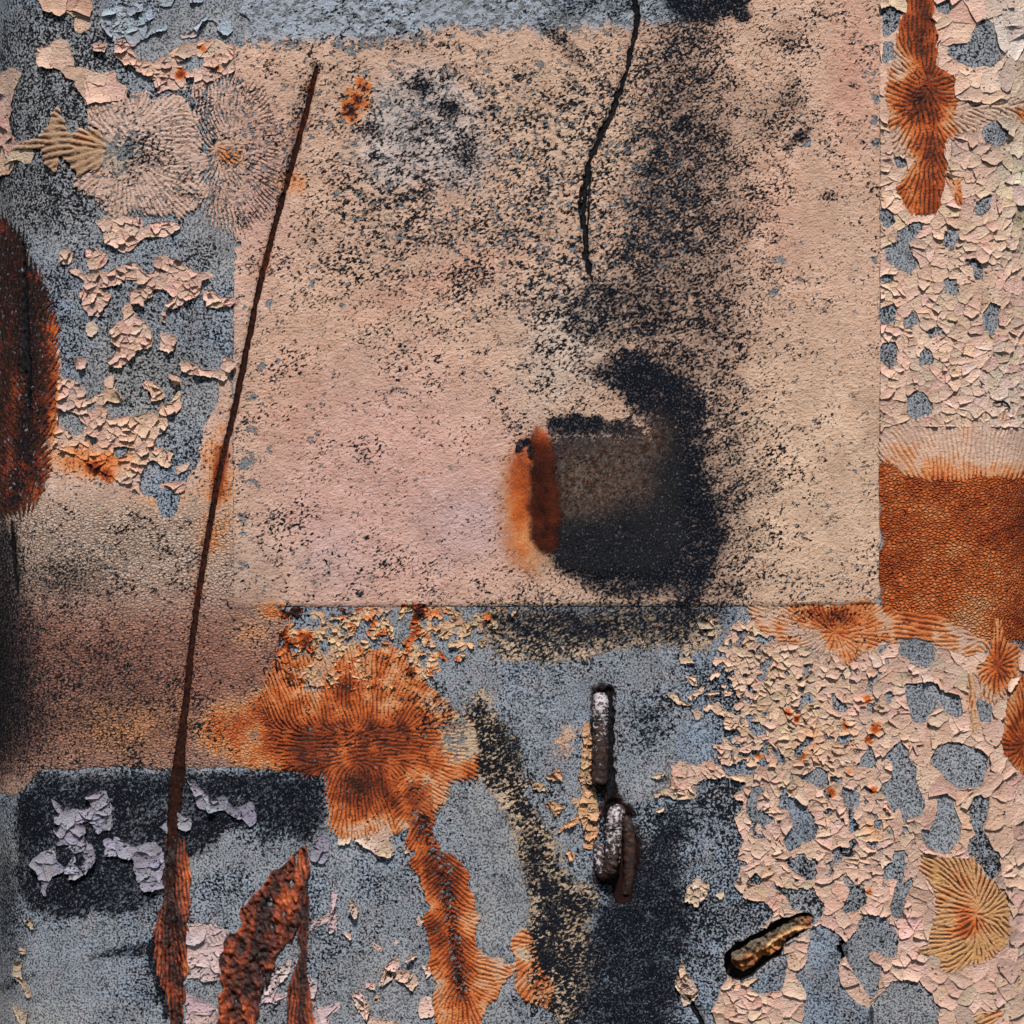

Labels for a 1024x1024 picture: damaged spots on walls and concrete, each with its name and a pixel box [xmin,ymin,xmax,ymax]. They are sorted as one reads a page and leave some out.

peeling [52,215,236,494]
leakage [348,23,485,172]
crack [578,0,641,283]
leakage [473,0,816,774]
peeling [879,110,1024,439]
corrosion [884,0,1024,216]
corrosion [747,460,1024,776]
peeling [28,790,165,896]
corrosion [218,846,316,1024]
corrosion [260,638,555,1024]
leakage [518,795,718,1024]
peeling [531,606,1024,1024]